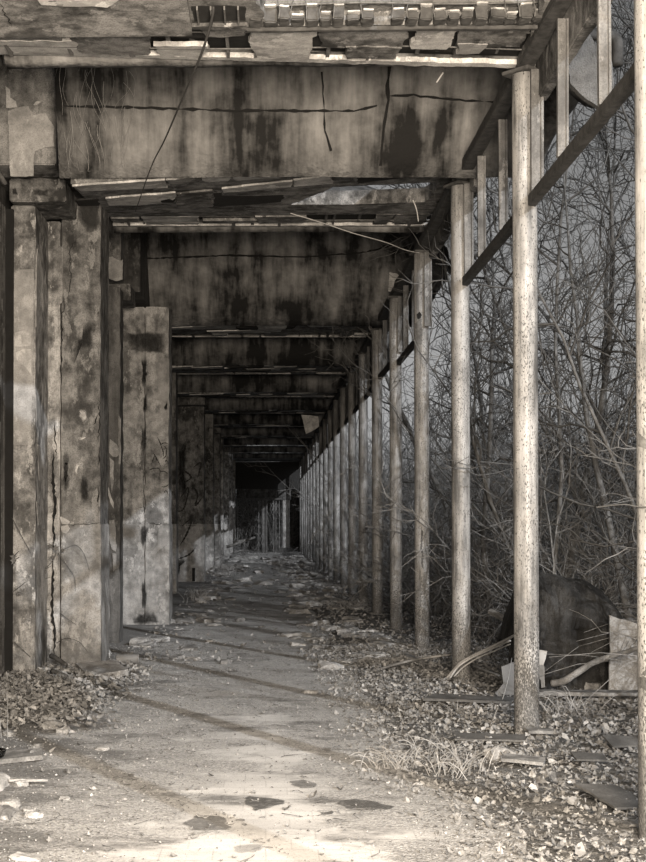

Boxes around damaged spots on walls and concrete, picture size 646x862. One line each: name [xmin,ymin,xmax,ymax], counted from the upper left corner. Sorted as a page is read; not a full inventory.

spalling [191,5,246,22]
crack [63,66,493,166]
crack [93,401,101,465]
crack [47,421,97,654]